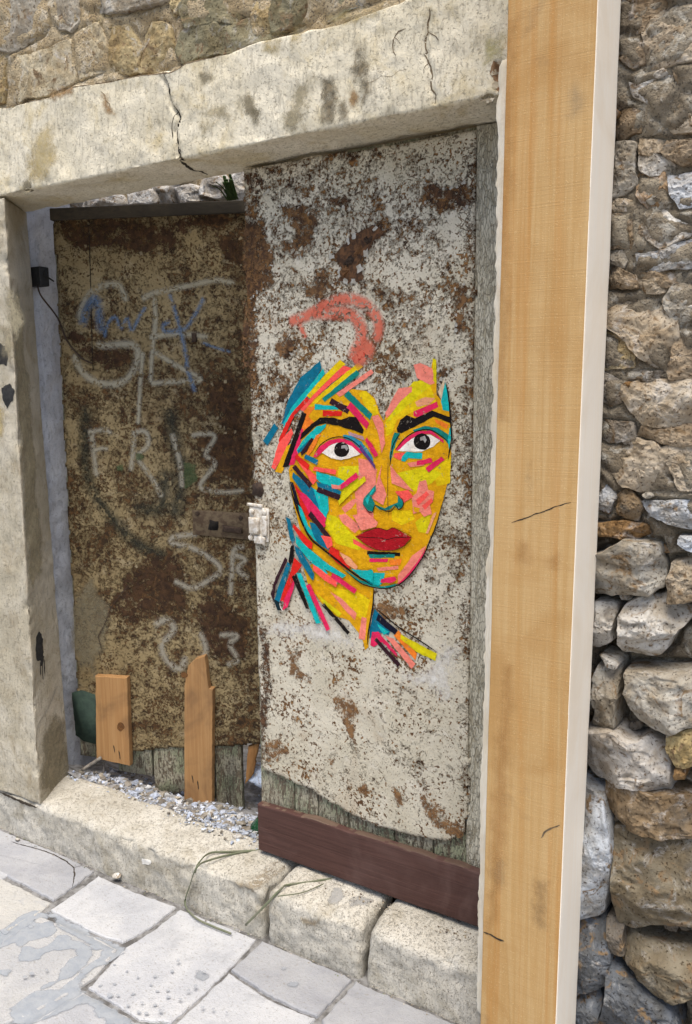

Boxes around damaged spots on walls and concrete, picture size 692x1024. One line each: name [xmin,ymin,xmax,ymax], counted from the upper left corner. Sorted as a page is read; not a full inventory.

crack [368,9,438,103]
crack [6,54,228,175]
leakage [284,86,308,126]
leakage [321,48,369,122]
crack [512,502,571,523]
rust [332,696,359,745]
rust [420,783,464,838]